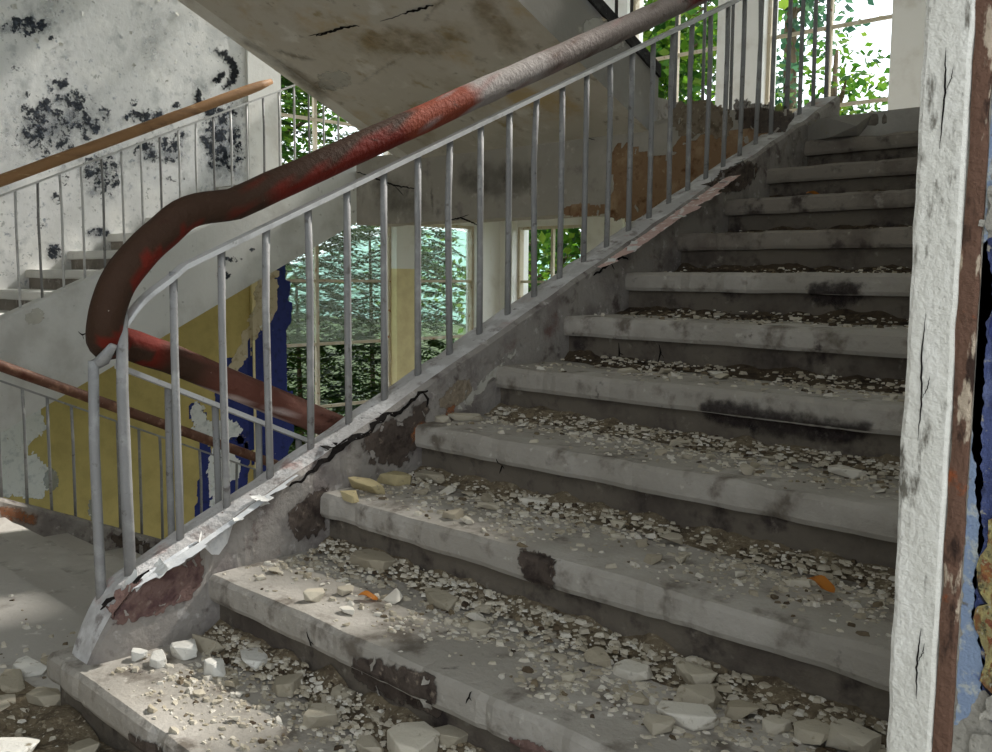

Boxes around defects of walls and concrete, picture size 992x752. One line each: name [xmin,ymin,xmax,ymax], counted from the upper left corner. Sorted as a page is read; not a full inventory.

crack [310,5,434,36]
flaking render [564,99,795,268]
peeling [978,185,992,230]
peeling [0,409,59,499]
peeling [190,401,243,507]
crack [289,390,429,487]
flaking render [106,475,298,625]
flaking render [517,548,556,590]
flaking render [351,654,442,718]